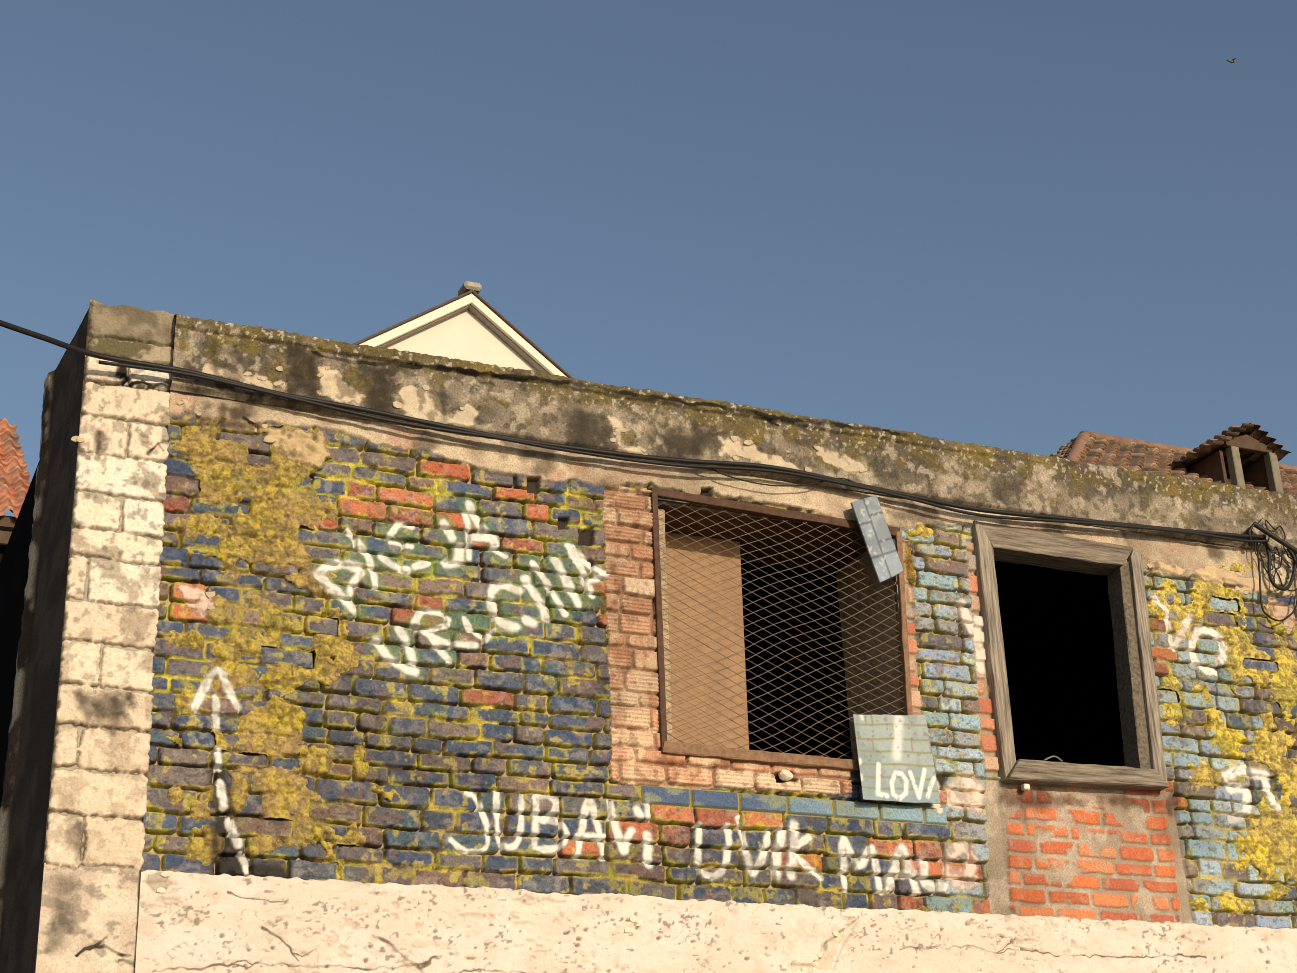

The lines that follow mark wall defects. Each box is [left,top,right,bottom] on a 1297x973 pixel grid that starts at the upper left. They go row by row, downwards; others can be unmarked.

flaking render [317,366,366,406]
damp [225,401,250,419]
damp [567,410,615,449]
damp [660,430,714,458]
flaking render [718,436,868,473]
crack [170,891,310,970]
crack [348,938,391,971]
crack [996,943,1207,958]